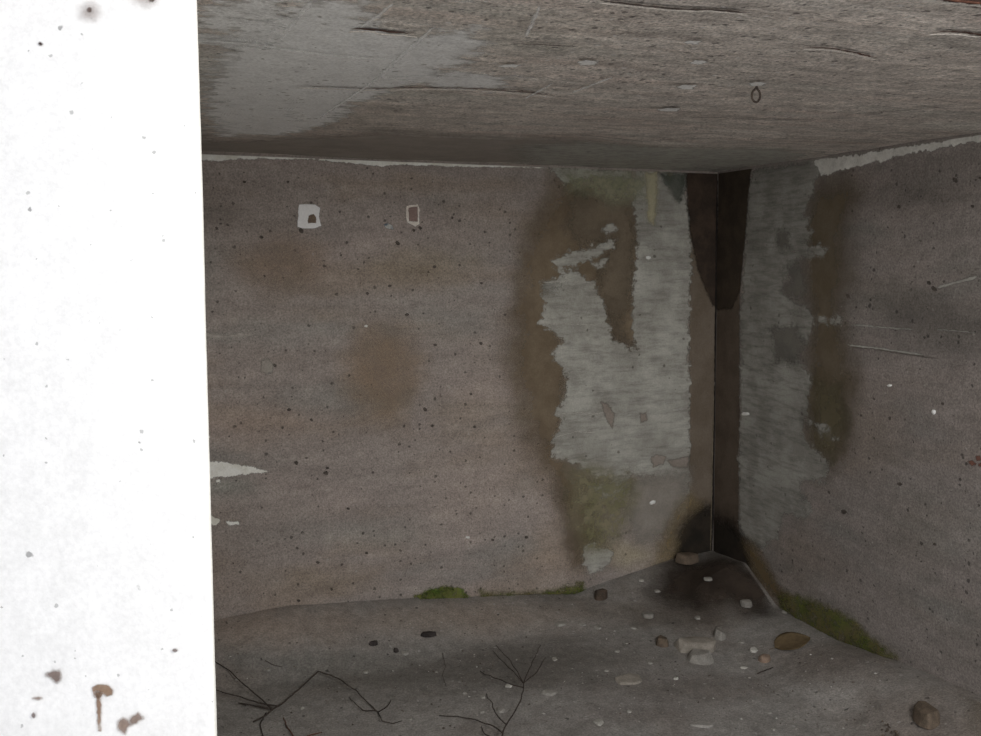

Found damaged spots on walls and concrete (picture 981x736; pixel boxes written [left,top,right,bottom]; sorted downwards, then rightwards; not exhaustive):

damp [197,0,515,137]
peeling [202,154,693,501]
damp [509,144,802,614]
damp [804,182,857,464]
peeling [736,135,981,549]
peeling [582,542,614,574]